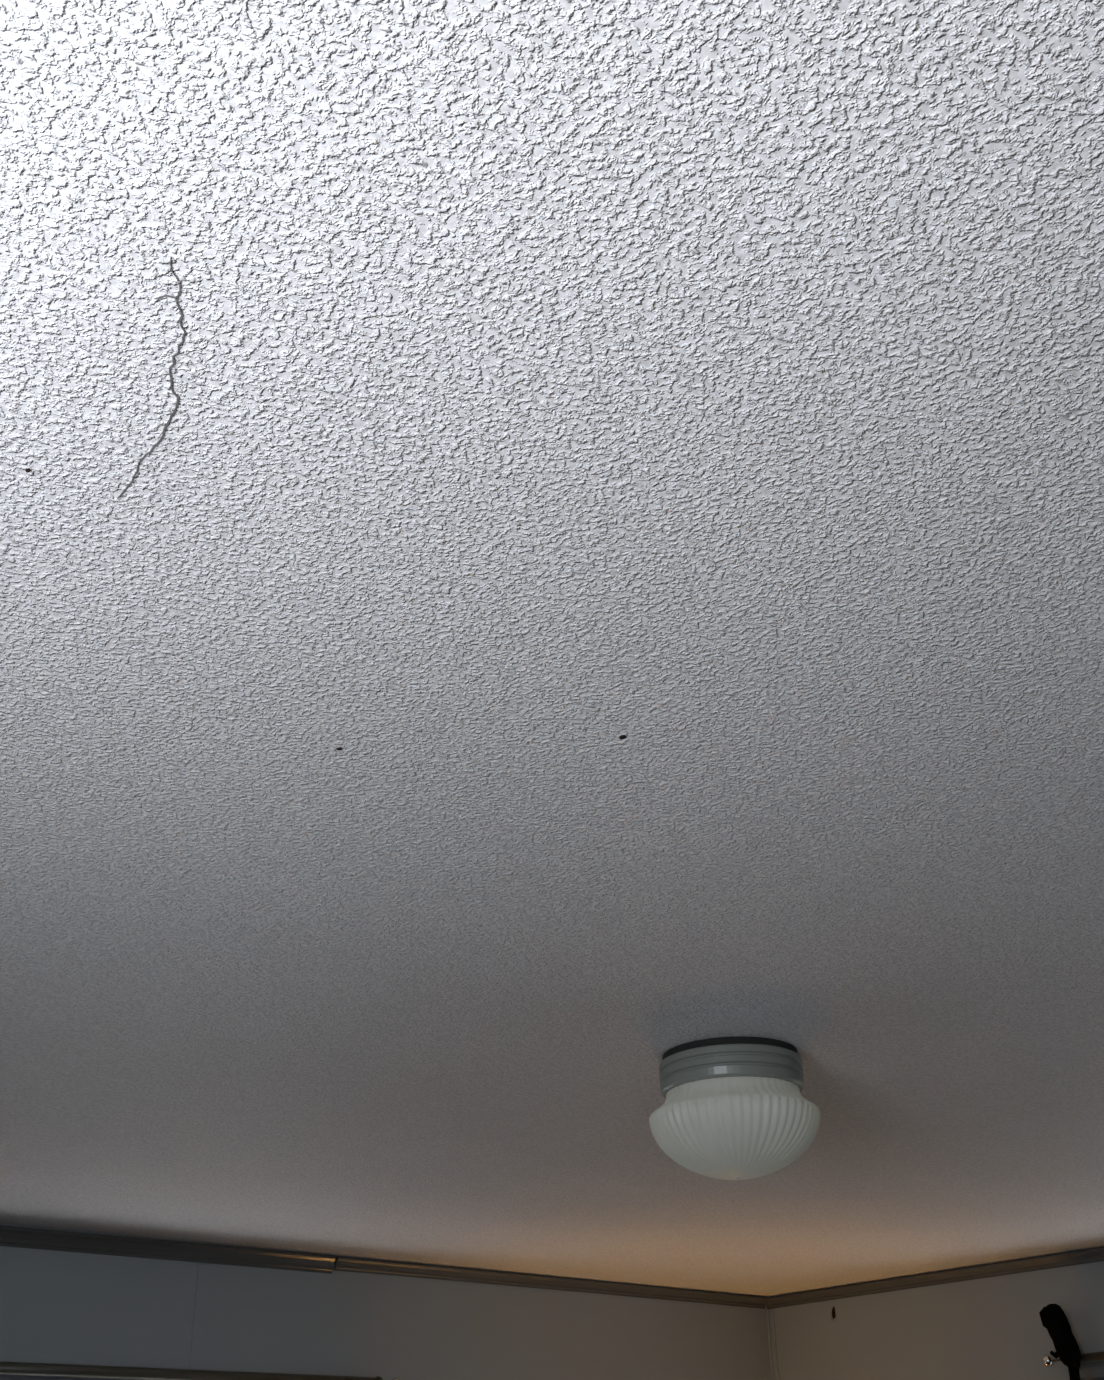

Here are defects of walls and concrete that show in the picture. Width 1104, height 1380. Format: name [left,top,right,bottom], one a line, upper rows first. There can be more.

crack [117,256,186,499]